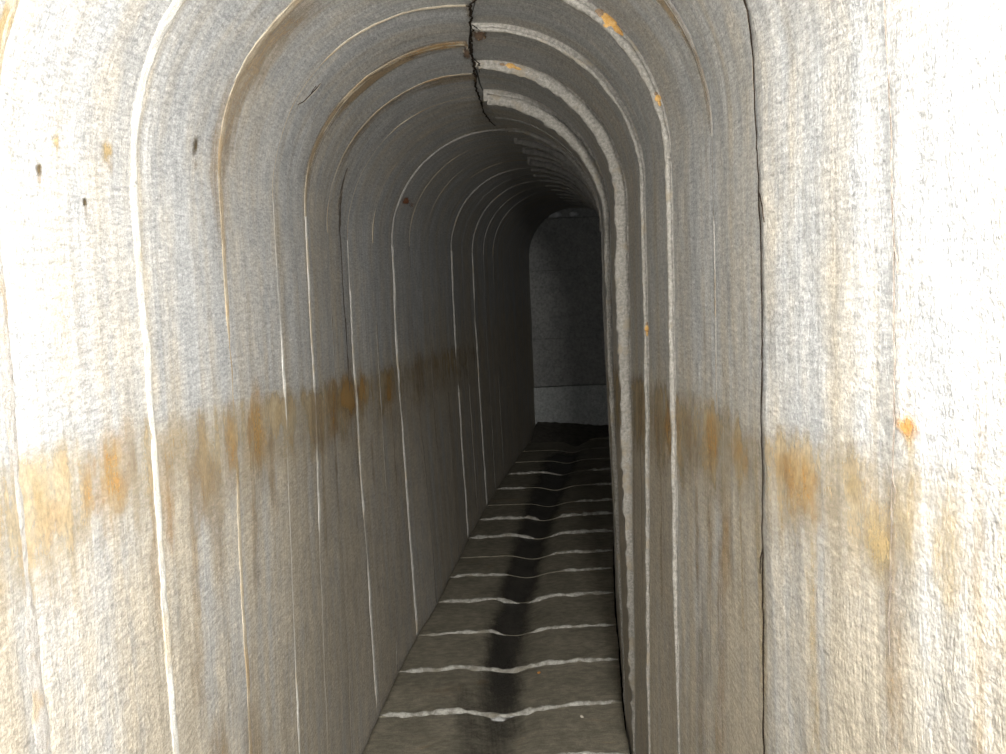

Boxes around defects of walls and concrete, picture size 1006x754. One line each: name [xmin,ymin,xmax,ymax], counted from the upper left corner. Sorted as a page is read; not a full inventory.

crack [466,0,496,126]
corrosion [595,9,624,36]
corrosion [312,376,365,434]
crack [743,0,765,754]
corrosion [897,418,917,438]
water stain [482,453,578,747]